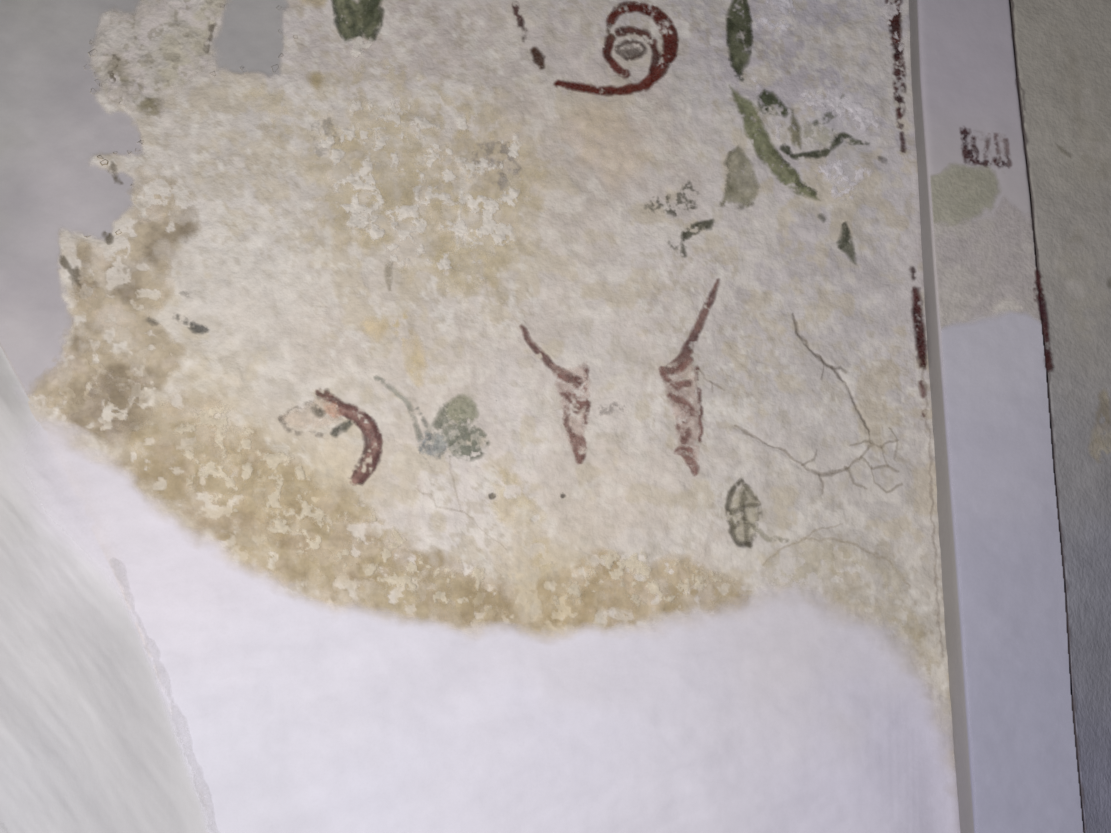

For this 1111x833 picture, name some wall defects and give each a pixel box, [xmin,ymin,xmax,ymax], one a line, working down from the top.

spalling [0,0,297,394]
leakage [37,195,511,623]
leakage [531,553,748,629]